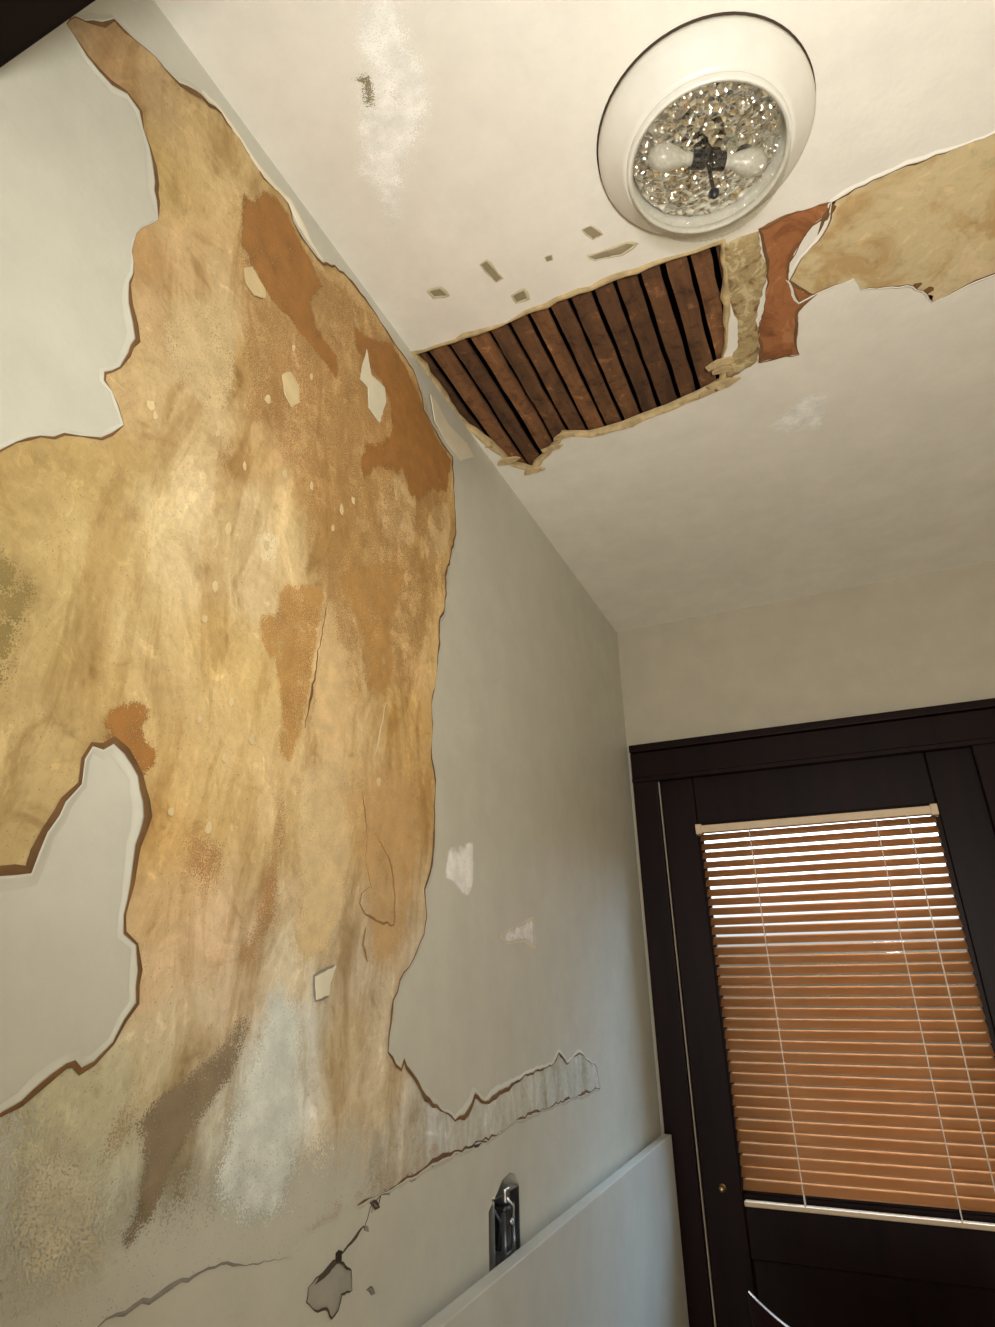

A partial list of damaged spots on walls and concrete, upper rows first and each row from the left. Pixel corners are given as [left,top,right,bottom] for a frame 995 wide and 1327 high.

damp [223,177,452,715]
damp [0,544,40,692]
peeling [0,13,741,1322]
damp [326,753,428,983]
damp [96,1013,250,1253]
crack [98,1257,285,1327]
crack [315,1194,386,1285]